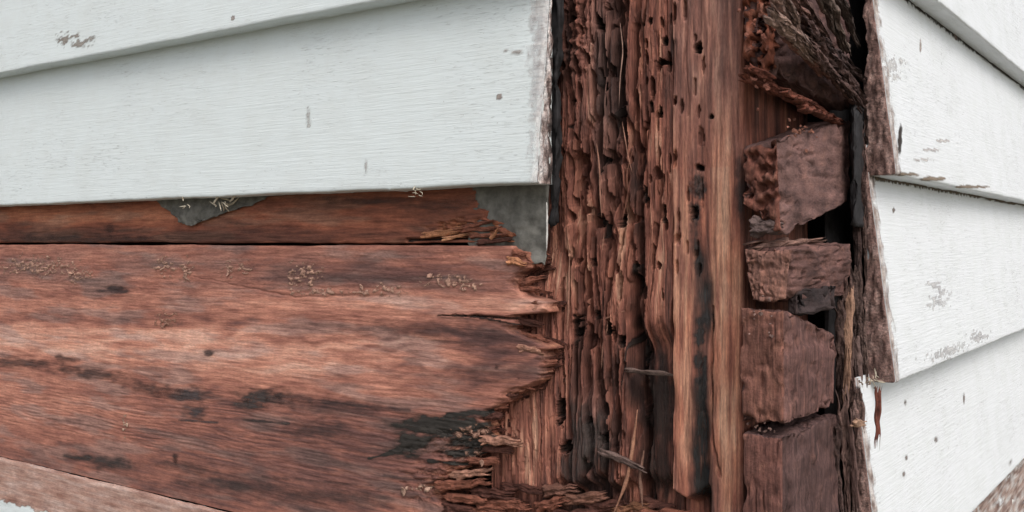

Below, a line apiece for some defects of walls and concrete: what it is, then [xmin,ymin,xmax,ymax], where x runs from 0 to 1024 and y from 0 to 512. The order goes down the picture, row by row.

peeling [58,31,94,47]
peeling [737,0,868,145]
spalling [0,219,527,257]
peeling [517,263,547,305]
peeling [927,282,951,310]
crack [438,315,522,325]
peeling [807,166,899,512]
peeling [927,330,989,362]
water stain [367,408,496,466]
spalling [0,456,232,512]
peeling [441,431,692,512]